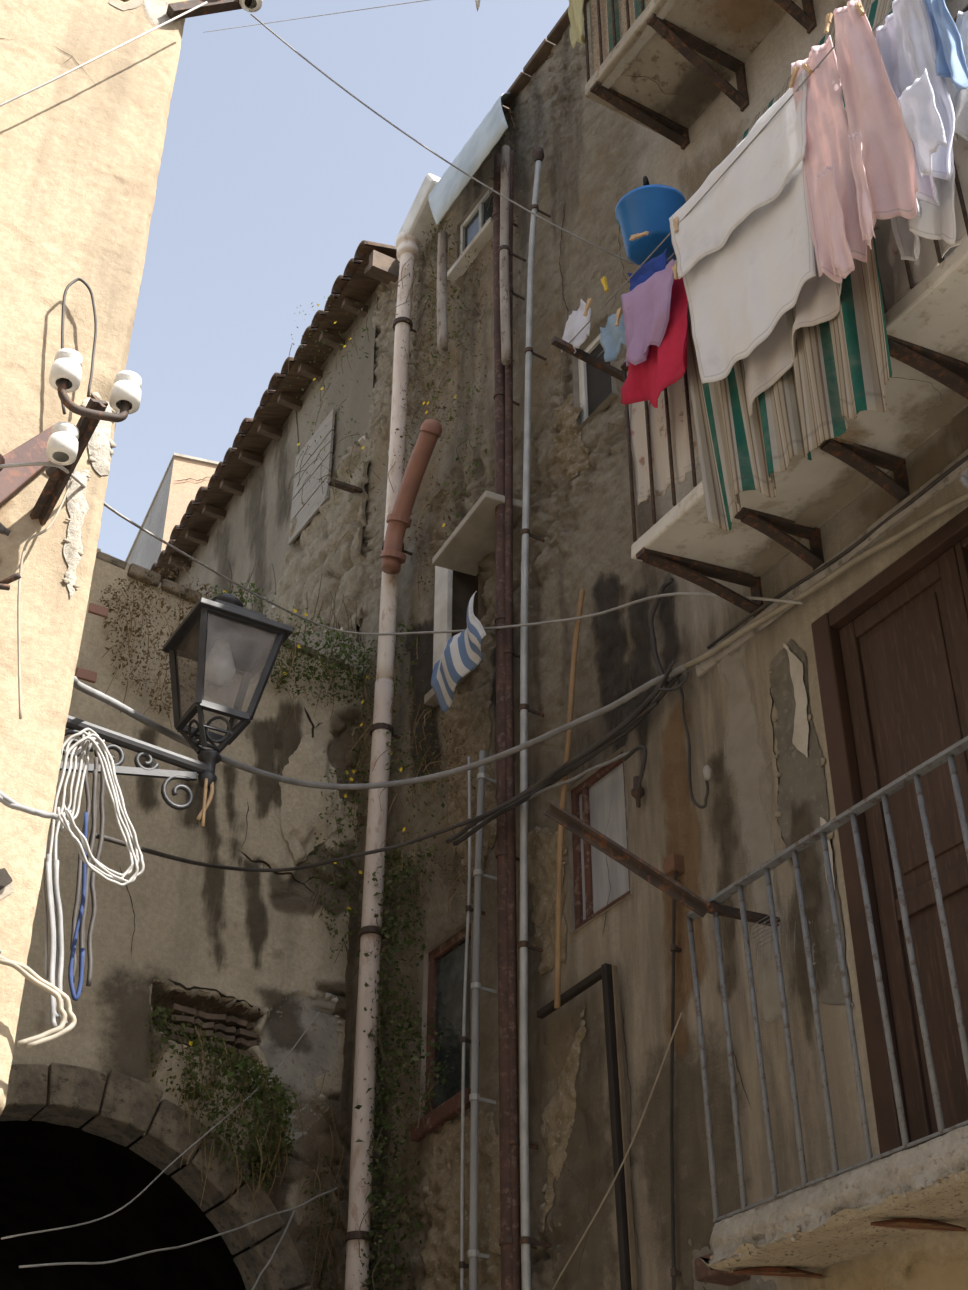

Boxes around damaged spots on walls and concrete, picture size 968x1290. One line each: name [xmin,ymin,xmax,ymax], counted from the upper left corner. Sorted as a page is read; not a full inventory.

spalling [870,1218,966,1231]
spalling [688,1239,823,1290]